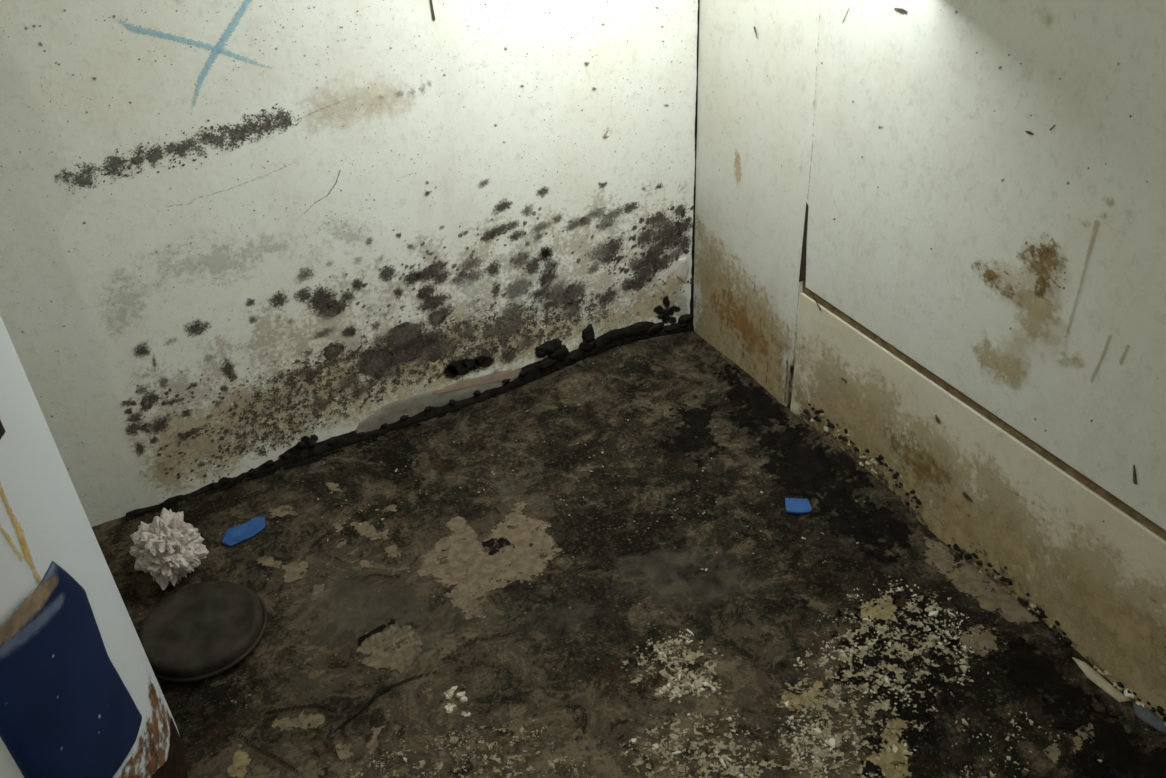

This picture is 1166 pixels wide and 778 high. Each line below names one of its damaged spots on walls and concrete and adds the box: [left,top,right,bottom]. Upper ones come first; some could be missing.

damp [55,104,299,194]
damp [121,186,694,490]
damp [972,232,1066,338]
damp [657,340,1166,719]
damp [988,637,1166,778]